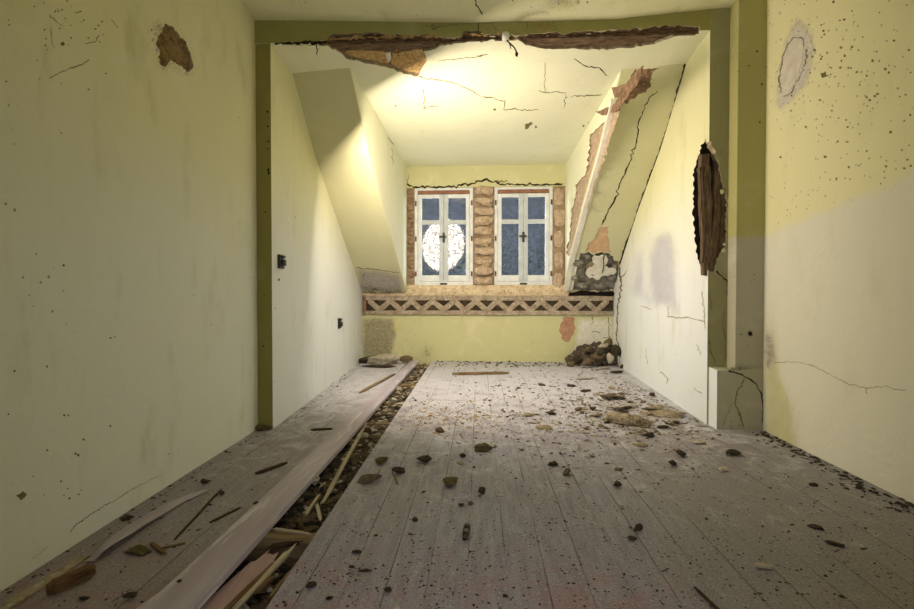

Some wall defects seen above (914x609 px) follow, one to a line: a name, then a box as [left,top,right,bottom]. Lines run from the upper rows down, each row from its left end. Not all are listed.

spalling [151,22,192,76]
spalling [308,22,699,74]
crack [419,0,607,111]
peeling [774,17,868,112]
spalling [553,66,656,296]
crack [592,64,686,357]
spalling [692,139,726,276]
peeling [559,317,613,353]
crack [642,270,763,428]
crack [773,361,906,394]